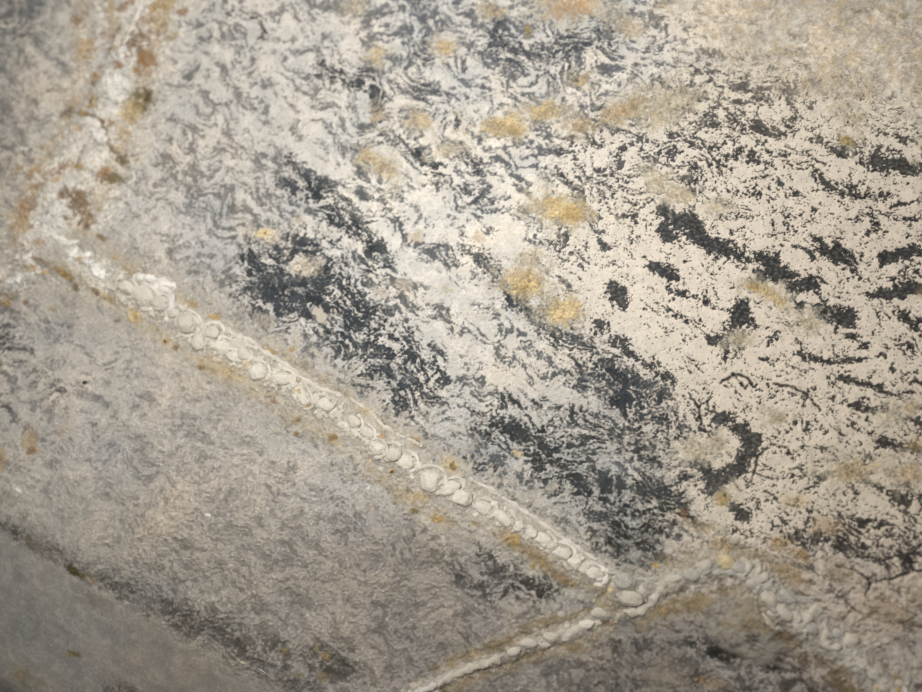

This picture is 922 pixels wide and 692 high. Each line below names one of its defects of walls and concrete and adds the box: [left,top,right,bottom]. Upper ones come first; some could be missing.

water stain [314,60,493,212]
water stain [234,153,451,418]
water stain [457,233,698,559]
crack [689,372,821,439]
crack [747,444,795,487]
water stain [490,567,560,598]
water stain [787,519,922,570]
crack [835,543,922,595]
water stain [705,634,773,670]